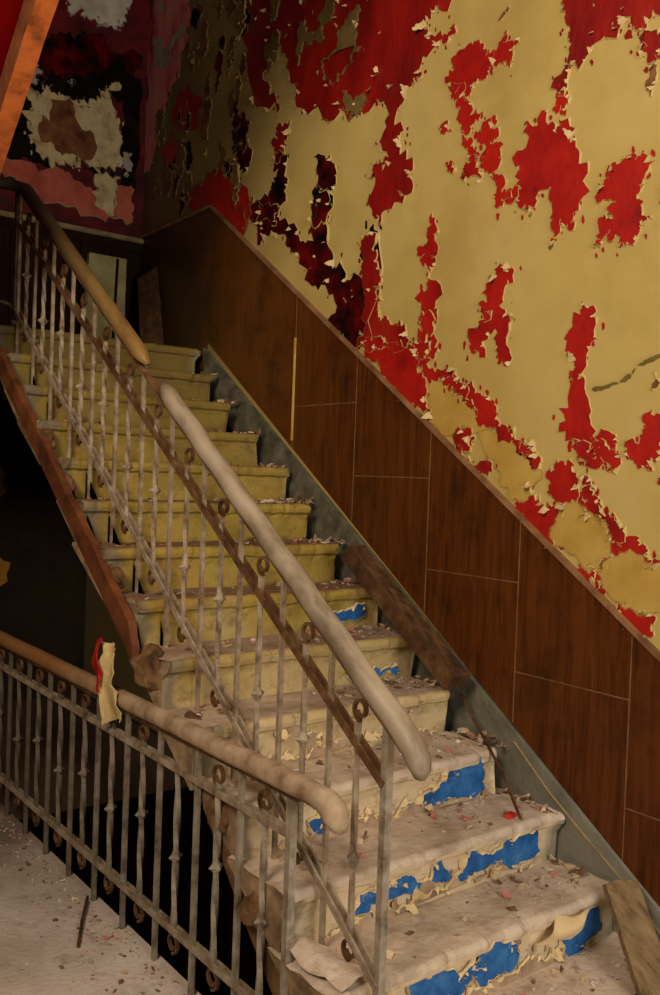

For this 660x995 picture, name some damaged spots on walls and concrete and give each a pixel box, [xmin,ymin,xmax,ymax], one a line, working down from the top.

spalling [66,0,133,31]
spalling [1,64,134,226]
peeling [152,0,660,595]
peeling [0,558,10,586]
peeling [333,602,366,623]
peeling [615,598,657,638]
peeling [373,662,399,677]
peeling [392,755,488,821]
peeling [304,807,379,843]
peeling [388,830,540,918]
peeling [326,882,377,939]
peeling [406,906,604,995]